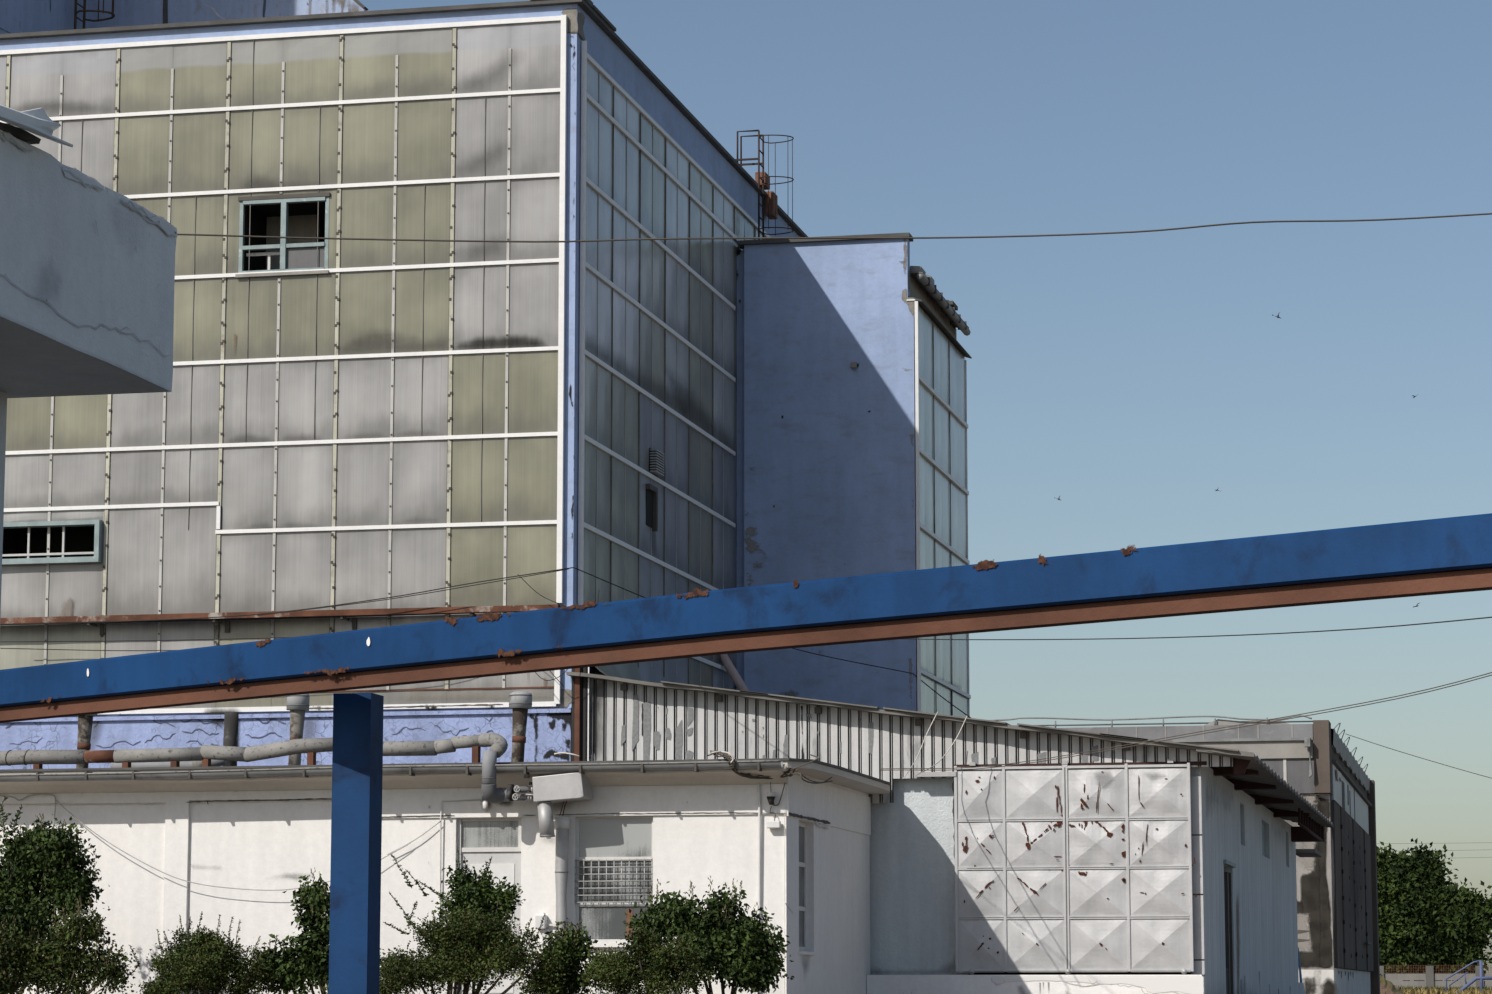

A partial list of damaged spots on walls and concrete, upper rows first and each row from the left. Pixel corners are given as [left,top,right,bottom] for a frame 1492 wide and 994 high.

crack [0,274,171,357]
corrosion [1022,771,1158,883]
water stain [1290,796,1351,994]